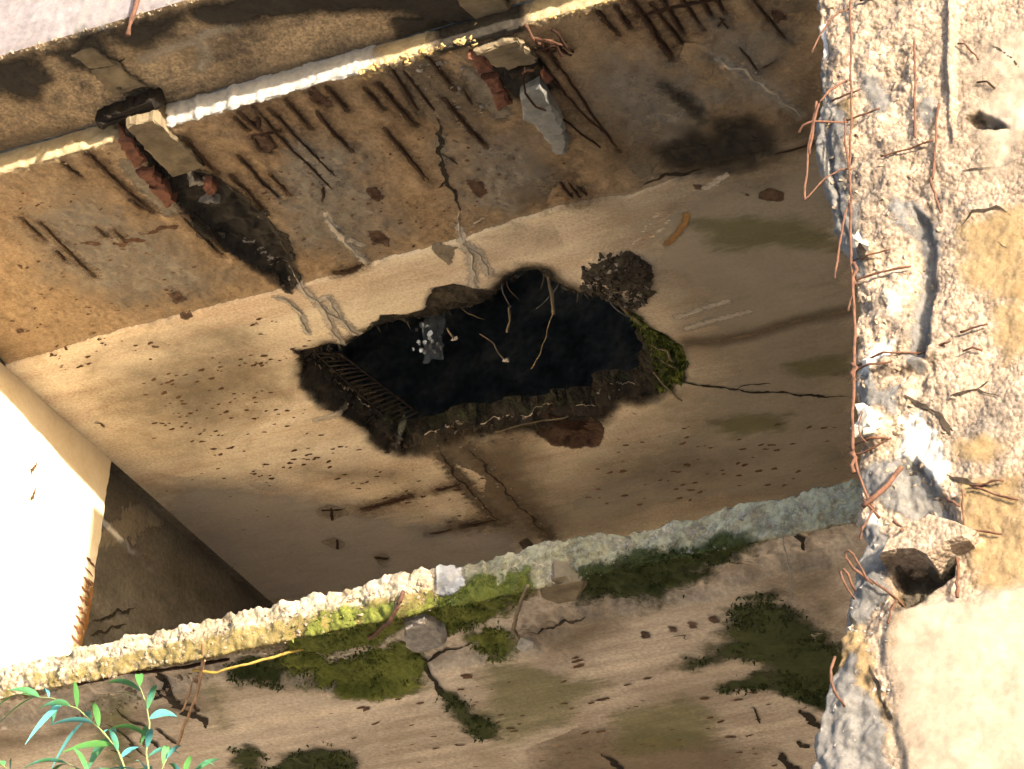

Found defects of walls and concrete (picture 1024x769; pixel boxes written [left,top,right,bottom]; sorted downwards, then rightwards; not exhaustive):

crack [435,116,461,211]
spalling [166,0,867,283]
spalling [0,139,285,364]
spalling [294,266,664,456]
crack [684,382,848,398]
spalling [856,374,900,416]
spalling [456,455,952,627]
corrosion [861,465,904,508]
spalling [0,554,440,701]